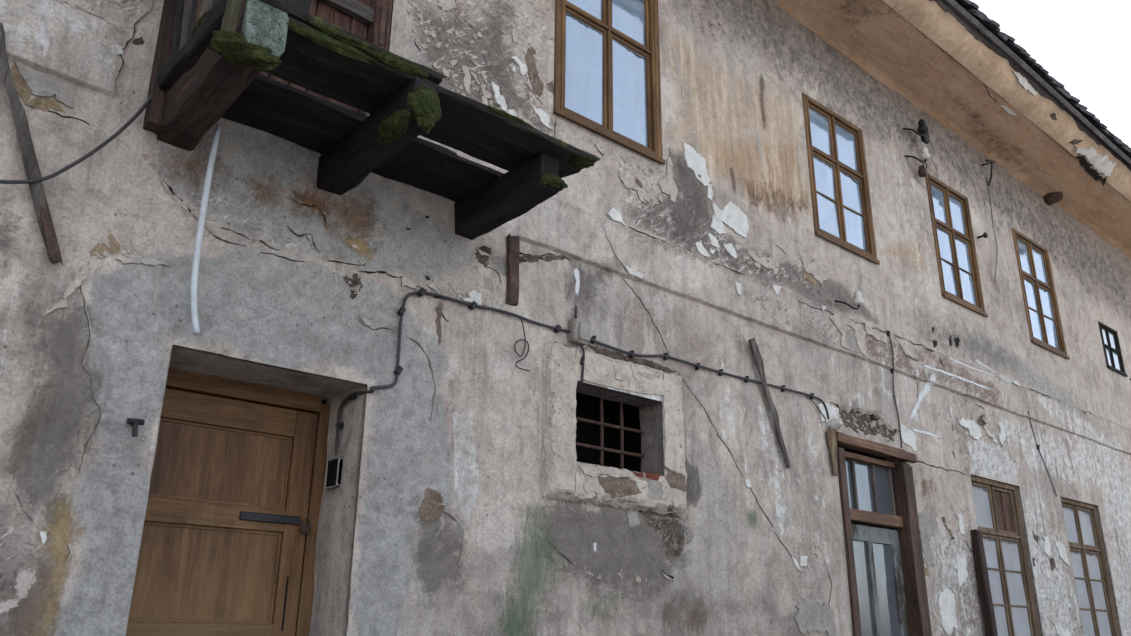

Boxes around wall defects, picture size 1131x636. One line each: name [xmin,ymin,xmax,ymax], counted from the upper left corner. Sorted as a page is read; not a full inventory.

peeling [407,0,518,117]
peeling [510,25,554,136]
crack [162,181,397,278]
peeling [617,156,649,204]
water stain [704,0,1131,317]
flaking render [1068,139,1116,187]
crack [43,264,101,476]
crack [604,208,792,557]
flaking render [579,464,687,508]
flaking render [918,507,979,636]
flaking render [1032,529,1074,636]